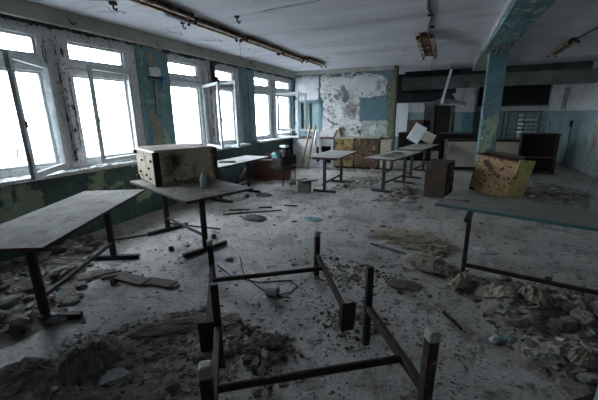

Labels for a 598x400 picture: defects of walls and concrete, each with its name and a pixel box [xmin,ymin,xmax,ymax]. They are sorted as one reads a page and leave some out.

peeling [0,13,389,160]
peeling [476,107,499,159]
peeling [0,183,44,225]
peeling [87,170,124,191]